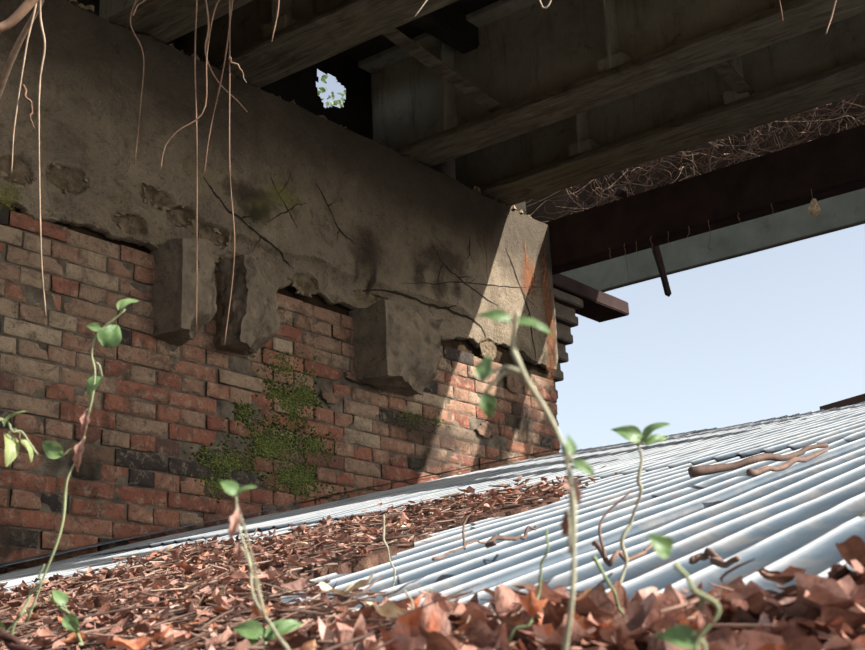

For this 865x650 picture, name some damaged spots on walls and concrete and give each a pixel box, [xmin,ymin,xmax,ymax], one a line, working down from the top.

spalling [0,155,88,195]
spalling [139,183,231,246]
spalling [288,273,320,298]
corrosion [524,243,555,369]
spalling [480,337,497,361]
damp [184,412,350,504]